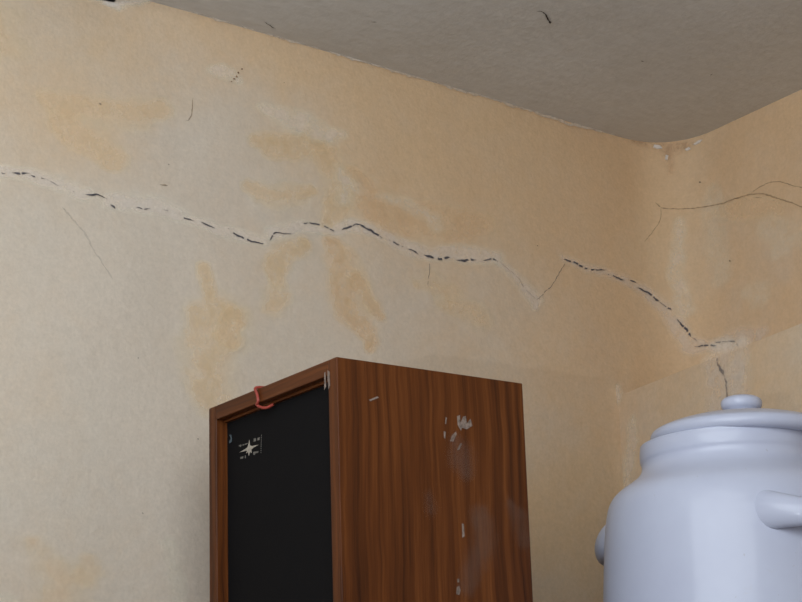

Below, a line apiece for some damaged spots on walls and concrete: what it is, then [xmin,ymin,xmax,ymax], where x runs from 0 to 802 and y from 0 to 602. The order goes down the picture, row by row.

crack [1,172,738,397]
crack [645,181,802,241]